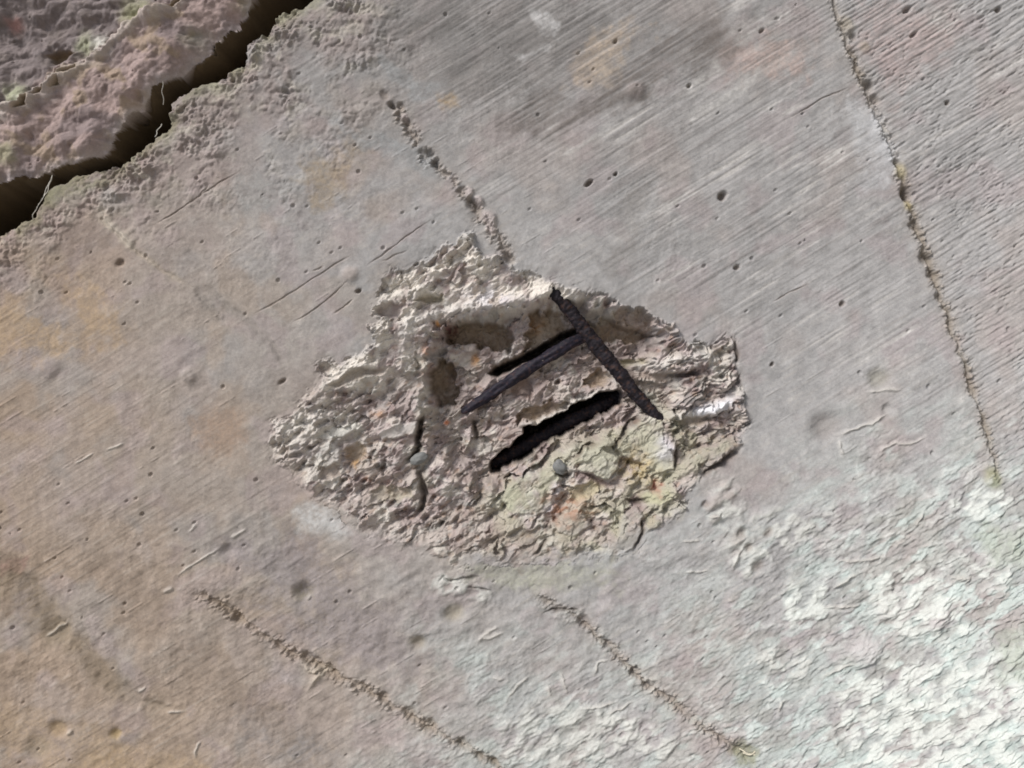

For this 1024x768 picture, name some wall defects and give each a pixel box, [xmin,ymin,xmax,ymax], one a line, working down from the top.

crack [0,0,314,237]
spalling [268,230,846,607]
crack [541,607,578,617]
peeling [555,608,593,631]
peeling [748,641,820,680]
leakage [987,614,1024,697]